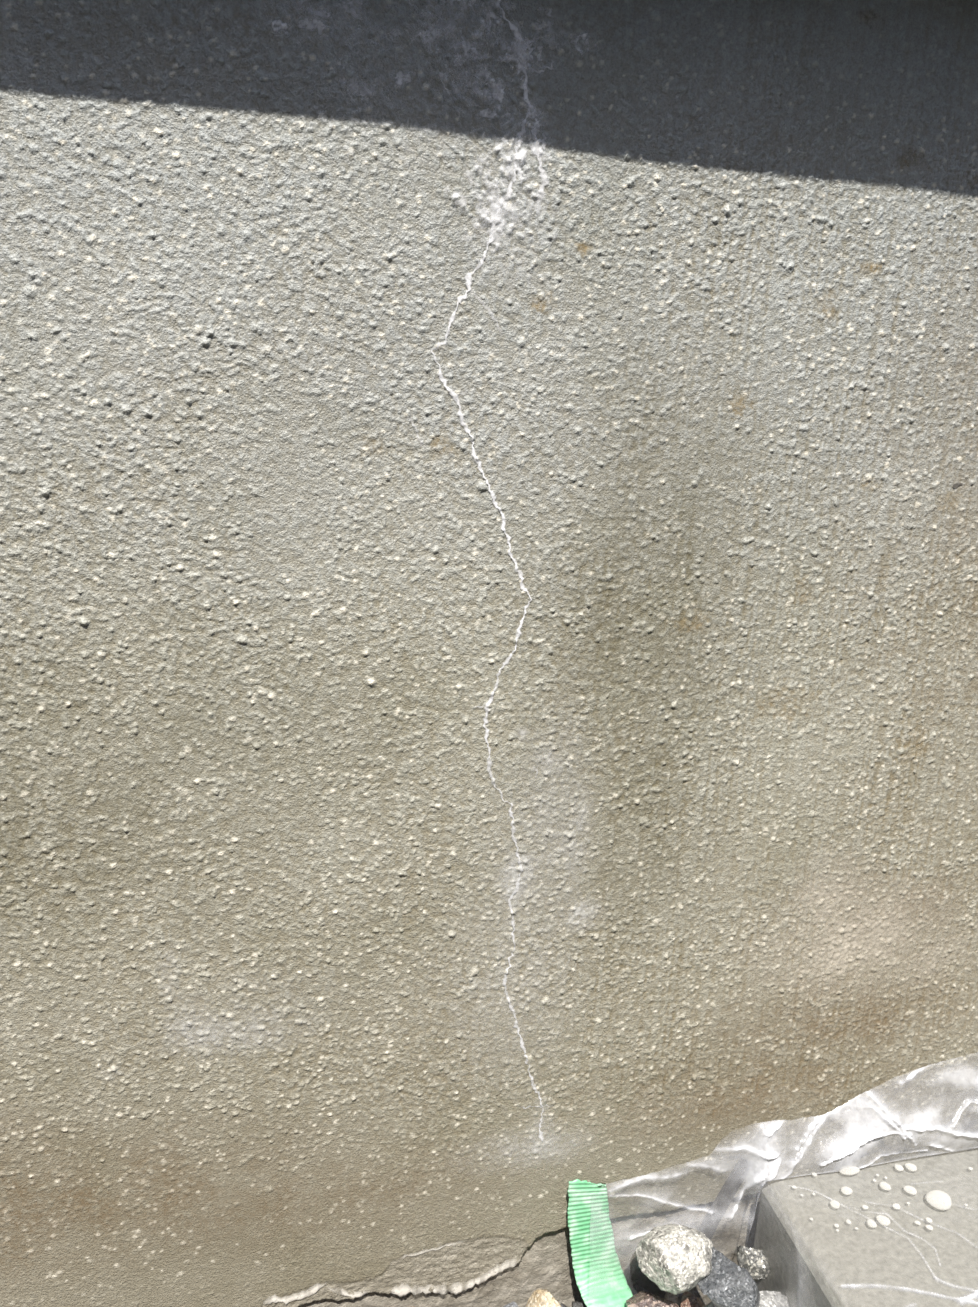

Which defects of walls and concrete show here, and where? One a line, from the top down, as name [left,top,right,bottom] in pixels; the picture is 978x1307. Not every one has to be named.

leakage [272,11,330,34]
leakage [415,3,541,118]
leakage [476,110,546,248]
crack [431,0,552,1141]
peeling [269,1286,322,1305]
peeling [392,1261,515,1298]